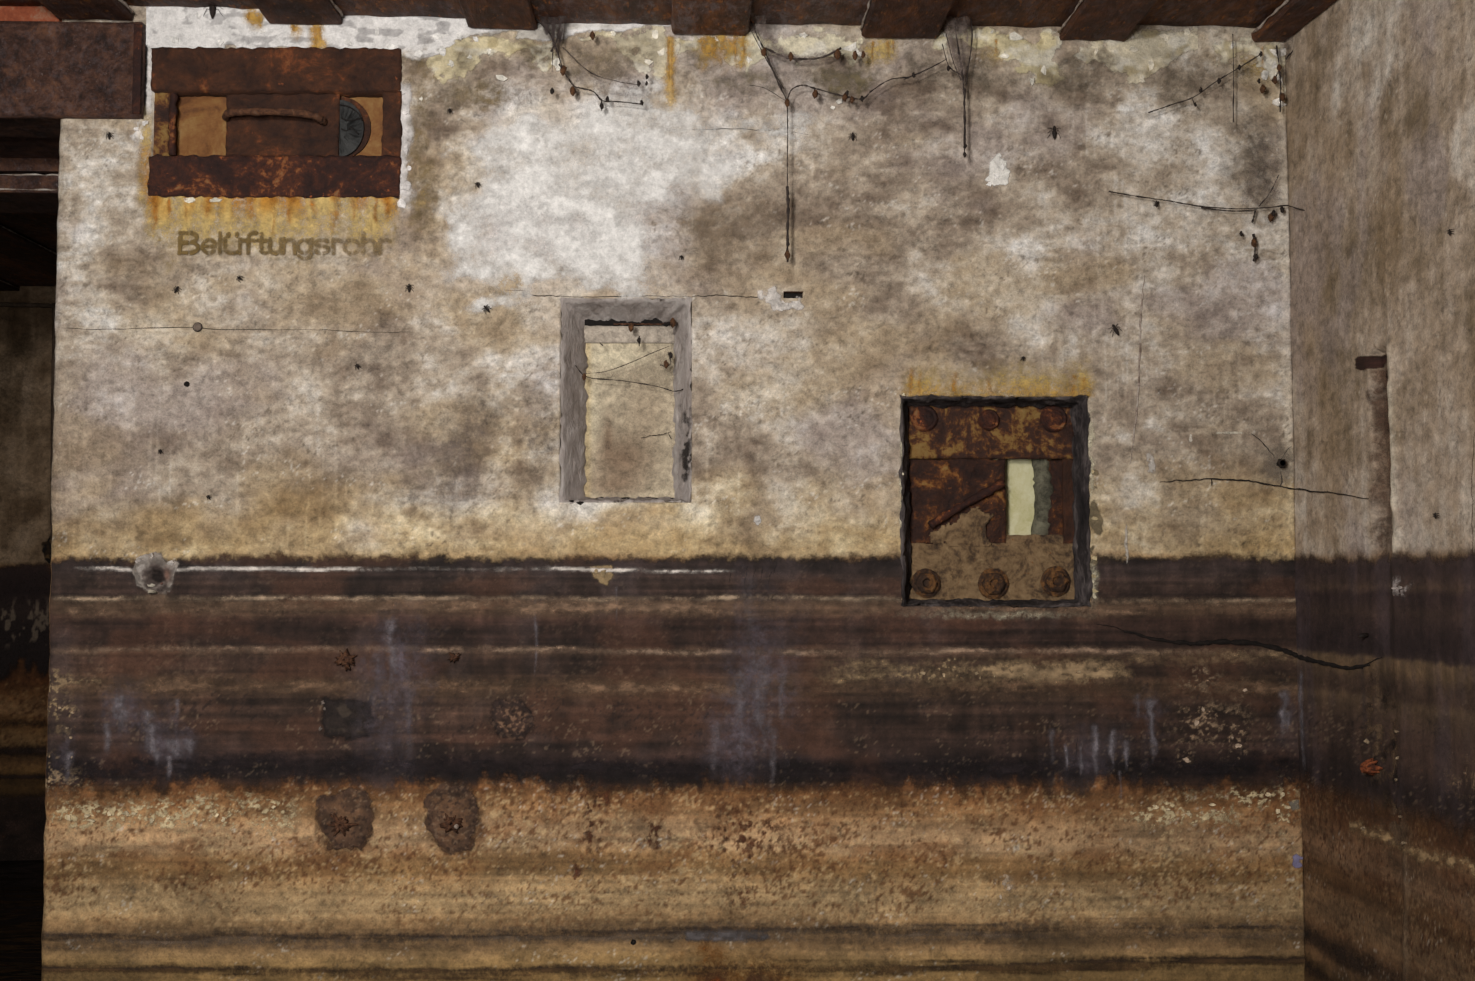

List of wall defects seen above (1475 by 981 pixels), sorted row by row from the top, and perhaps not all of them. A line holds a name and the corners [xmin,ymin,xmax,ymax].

rust [139,125,398,250]
rust [904,372,1093,396]
crack [1161,434,1369,499]
crack [1098,624,1382,670]
damp [0,549,1475,876]